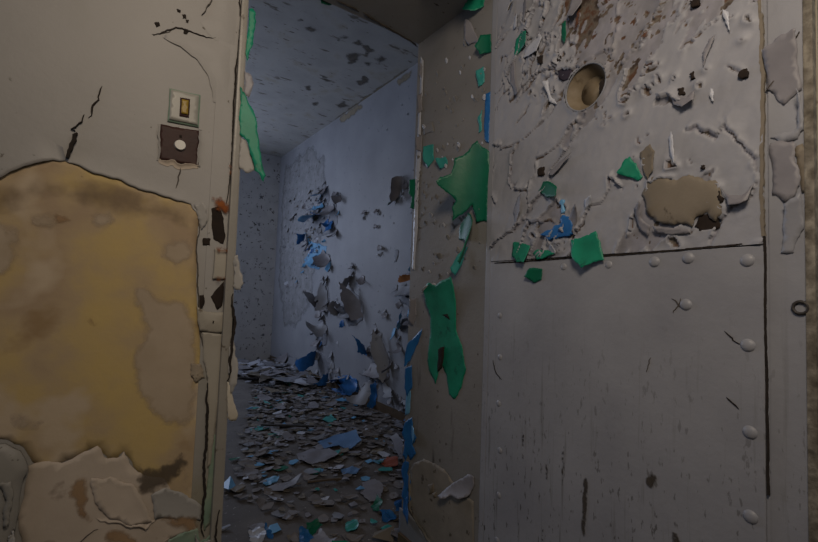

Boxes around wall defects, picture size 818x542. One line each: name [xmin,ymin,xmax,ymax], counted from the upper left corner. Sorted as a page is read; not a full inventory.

crack [153,0,216,38]
peeling [245,8,256,60]
crack [65,86,102,159]
peeling [239,71,266,181]
peeling [276,0,805,542]
peeling [0,126,215,542]
peeling [261,473,302,491]
peeling [248,523,274,542]